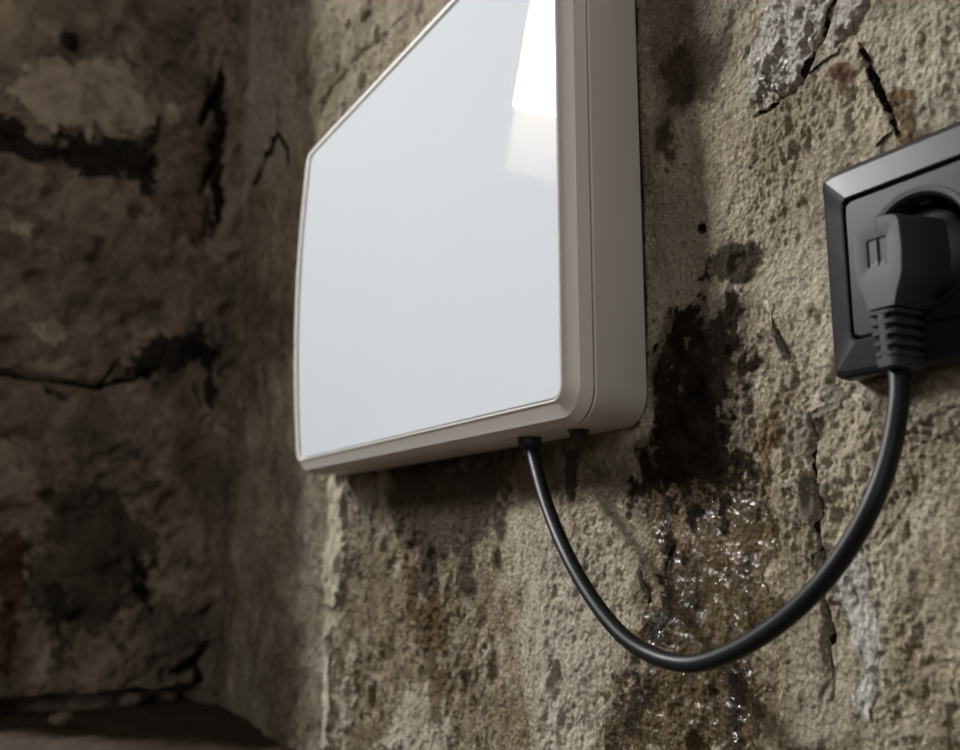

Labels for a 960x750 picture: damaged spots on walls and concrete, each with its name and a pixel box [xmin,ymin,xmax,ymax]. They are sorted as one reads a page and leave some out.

crack [200,62,229,240]
crack [248,94,290,189]
crack [759,89,785,115]
crack [801,0,901,147]
crack [0,363,141,399]
water stain [622,240,783,655]
crack [810,428,826,575]
water stain [516,523,771,750]
crack [826,602,844,670]
water stain [833,550,886,732]